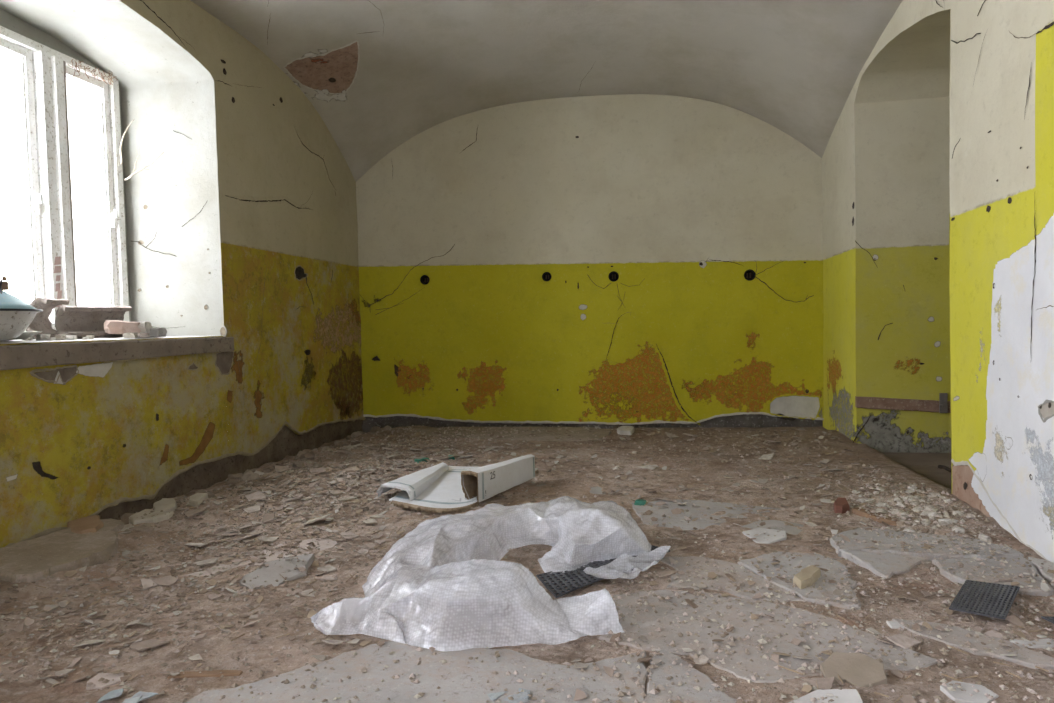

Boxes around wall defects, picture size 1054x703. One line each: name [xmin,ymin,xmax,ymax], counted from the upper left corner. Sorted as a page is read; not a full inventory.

crack [140,0,195,50]
flaking render [284,40,360,102]
crack [973,22,1054,85]
crack [225,188,314,212]
flaking render [29,362,113,385]
crack [656,344,701,425]
flaking render [853,213,1054,563]
flaking render [87,332,842,520]
flaking render [32,461,58,480]
peeling [249,537,337,554]
peeling [86,673,124,690]